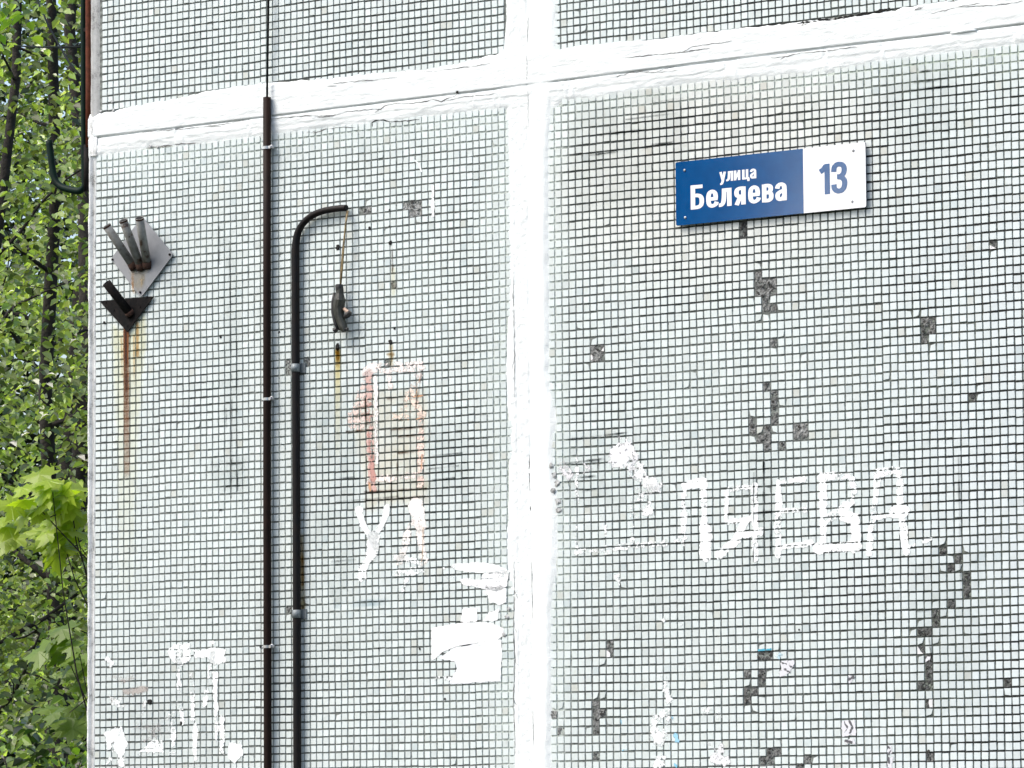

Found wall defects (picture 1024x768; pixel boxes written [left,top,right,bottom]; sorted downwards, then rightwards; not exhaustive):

peeling [403,200,422,217]
peeling [755,271,777,312]
peeling [921,317,936,344]
peeling [749,383,808,451]
peeling [917,547,971,708]
peeling [744,652,794,704]
peeling [593,701,606,734]